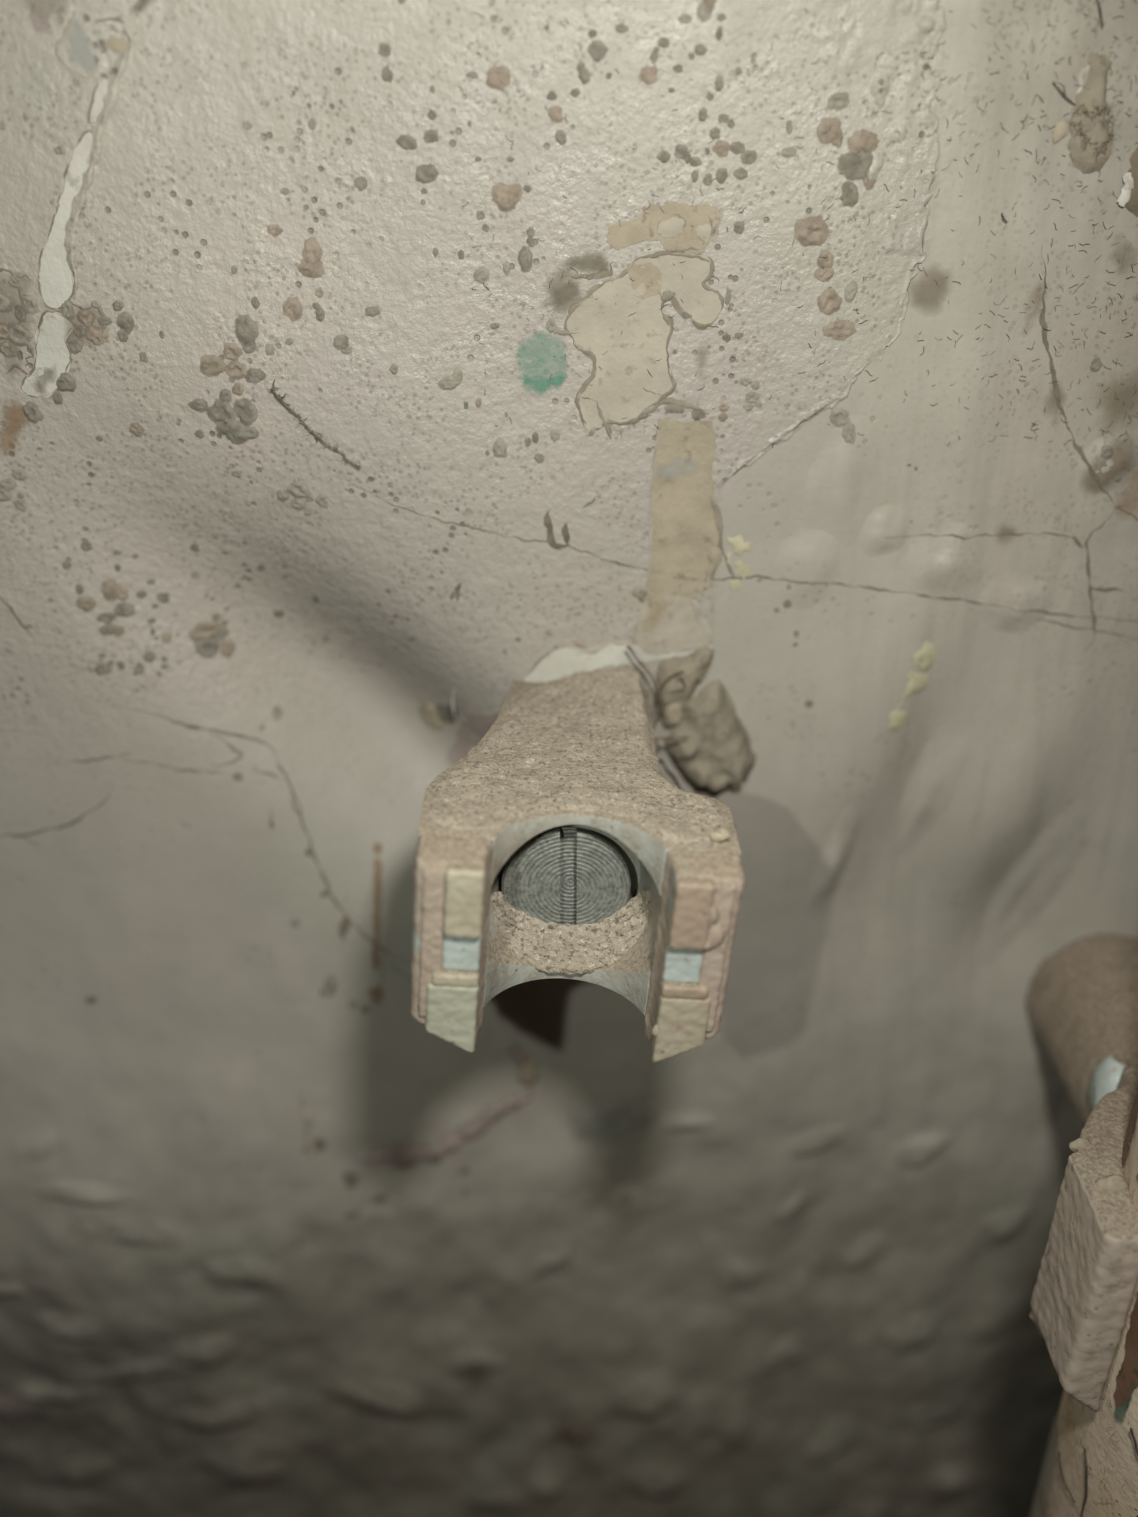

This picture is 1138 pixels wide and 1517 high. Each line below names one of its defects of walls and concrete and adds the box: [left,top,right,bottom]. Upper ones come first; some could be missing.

crack [0,6,140,449]
peeling [521,0,947,683]
crack [332,245,1138,652]
spalling [1052,50,1138,217]
crack [0,597,31,635]
crack [0,703,411,965]
rust [373,844,382,969]